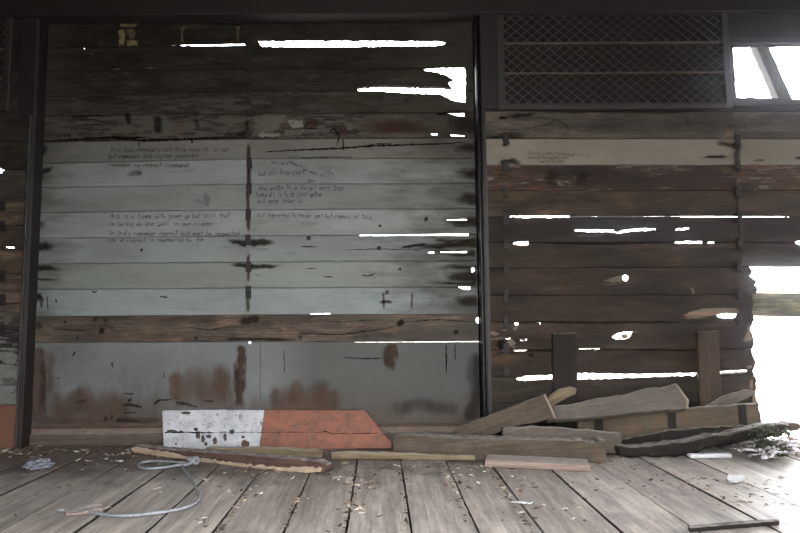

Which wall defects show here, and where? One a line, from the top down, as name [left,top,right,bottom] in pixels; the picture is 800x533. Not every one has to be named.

peeling [0,352,18,405]
rust [32,348,46,420]
rust [171,345,246,404]
rust [384,345,398,368]